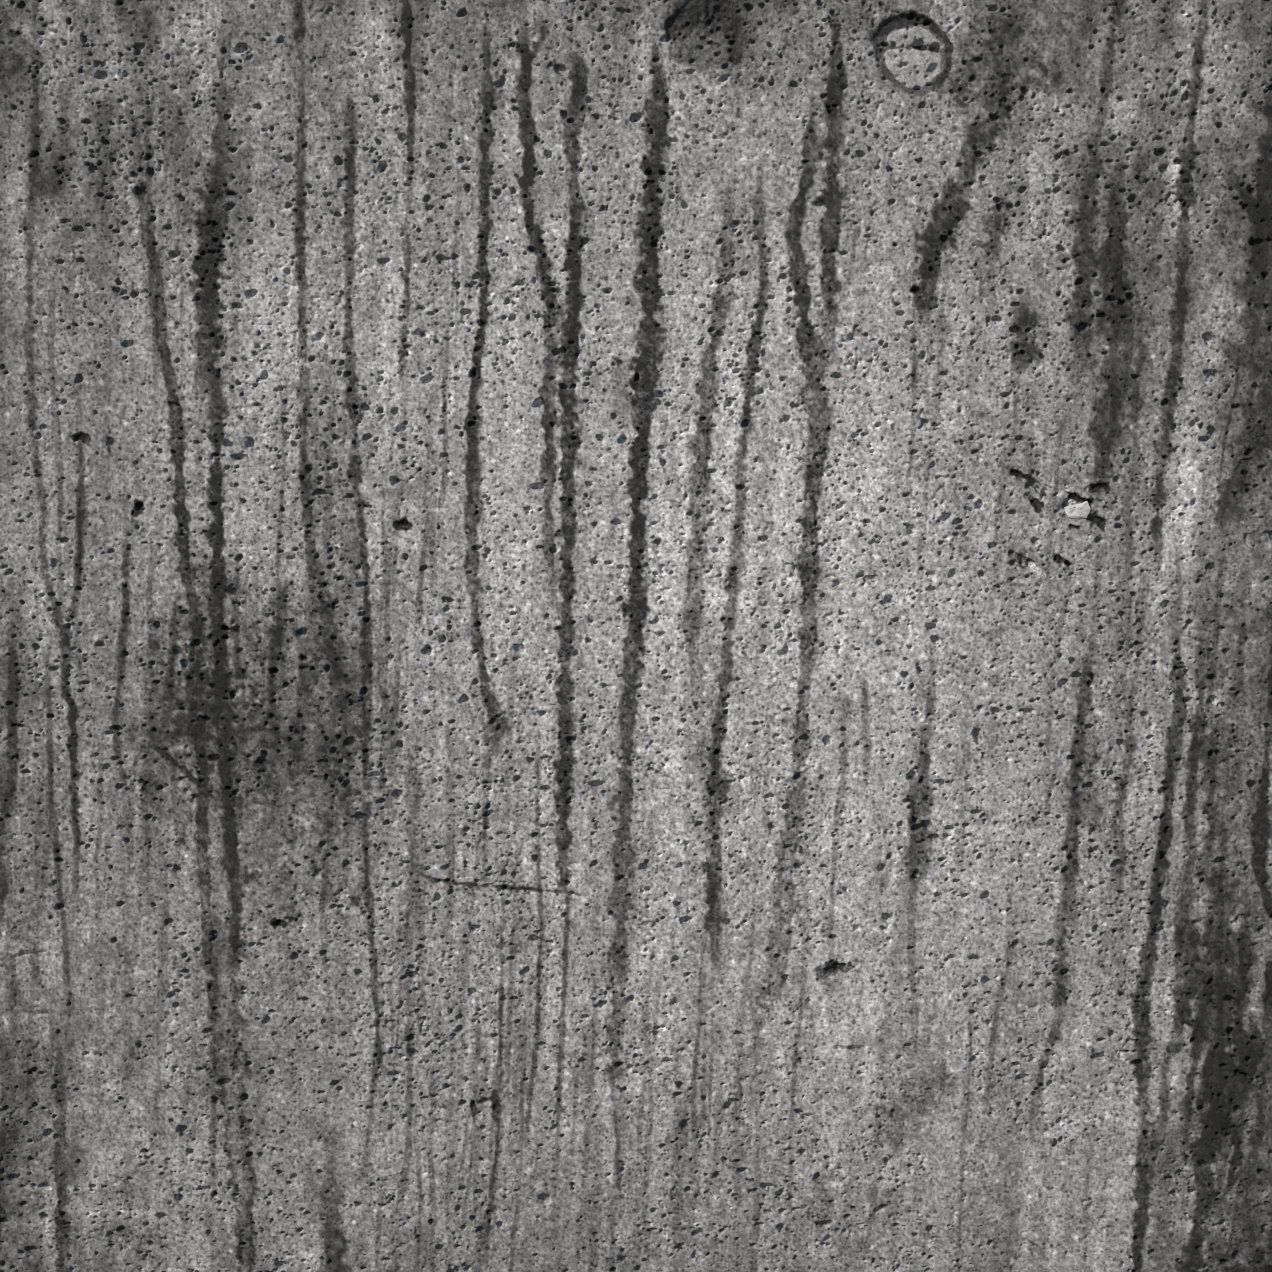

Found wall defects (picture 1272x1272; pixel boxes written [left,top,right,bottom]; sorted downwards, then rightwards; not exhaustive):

damp [38,500,86,904]
damp [113,88,385,1272]
damp [399,0,415,182]
damp [462,38,507,745]
damp [516,27,588,1135]
damp [606,55,671,1077]
damp [691,238,735,500]
damp [702,485,745,952]
damp [736,206,770,468]
damp [774,21,846,921]
damp [913,20,1061,311]
damp [1130,638,1272,1272]